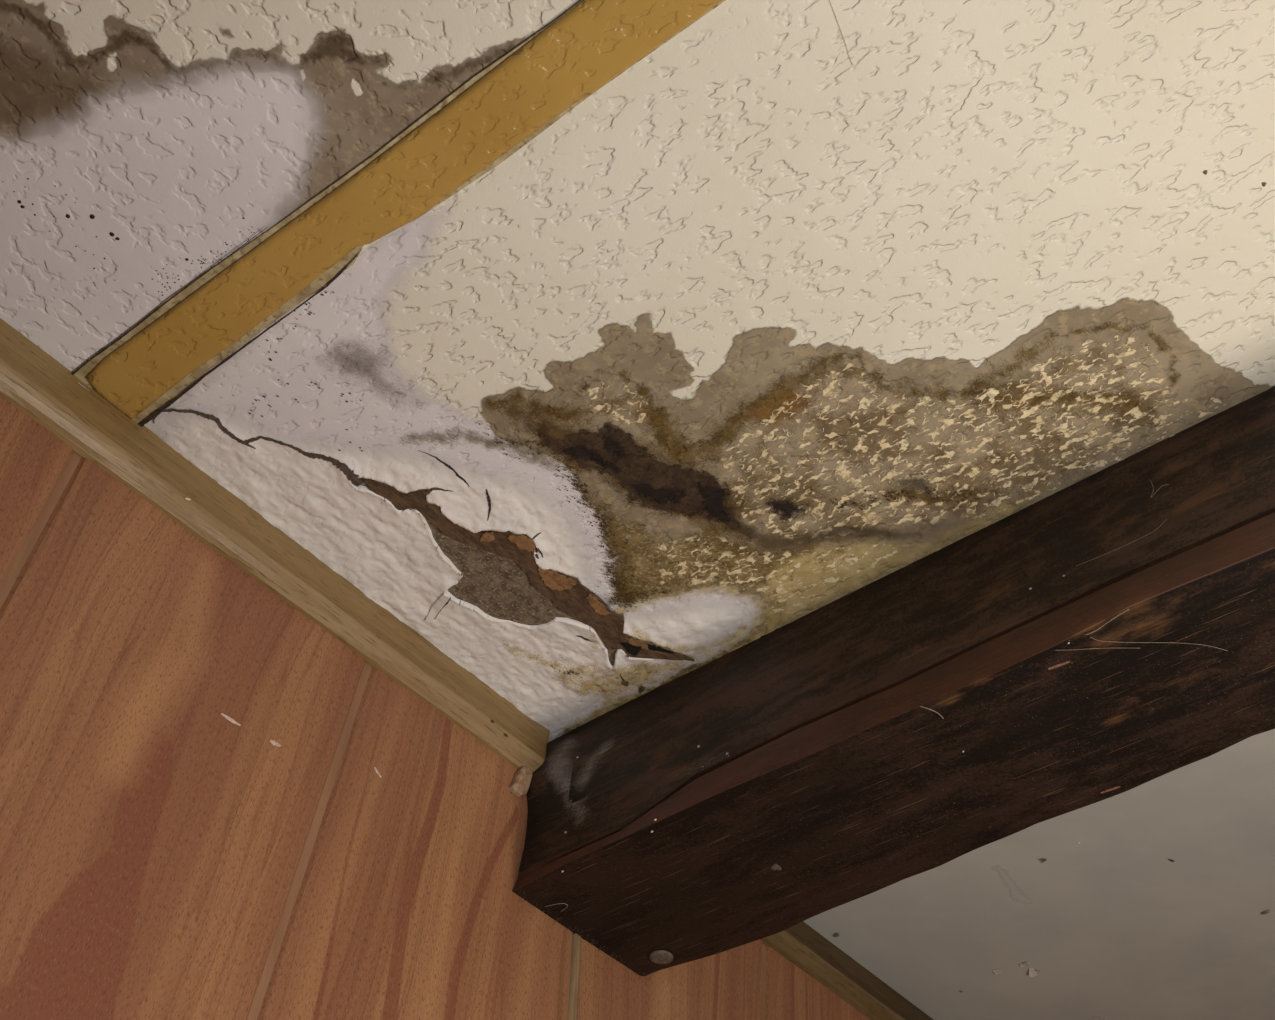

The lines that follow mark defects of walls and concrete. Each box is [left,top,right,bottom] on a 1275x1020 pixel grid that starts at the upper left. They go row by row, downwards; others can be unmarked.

damp [0,0,527,224]
crack [153,409,363,487]
crack [420,451,491,519]
spalling [359,478,695,666]
damp [406,298,1272,739]